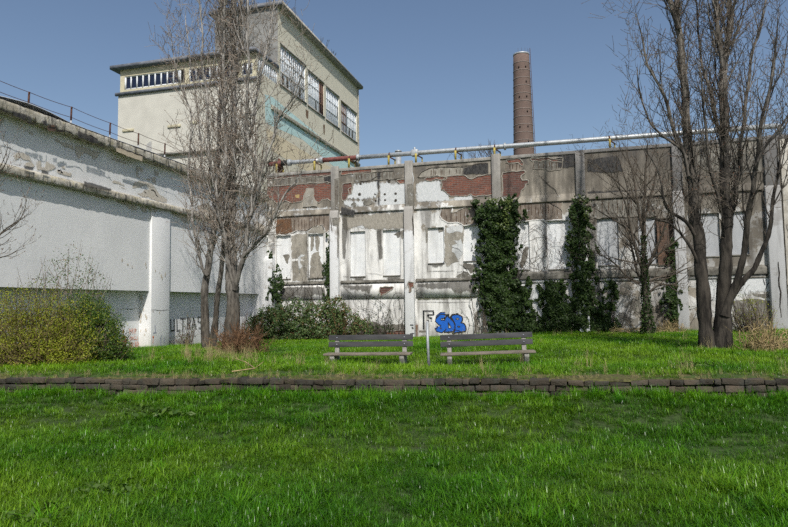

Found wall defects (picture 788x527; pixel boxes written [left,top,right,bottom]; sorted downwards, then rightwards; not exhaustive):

peeling [89,167,167,212]
flaking render [266,157,563,282]
crack [763,262,782,317]